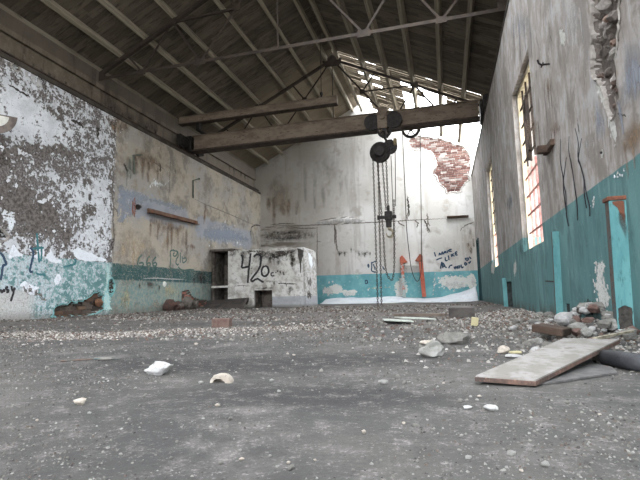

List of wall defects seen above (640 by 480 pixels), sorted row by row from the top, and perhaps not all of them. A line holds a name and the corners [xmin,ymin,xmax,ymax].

spalling [588,0,621,147]
peeling [41,102,68,124]
spalling [408,135,472,194]
peeling [0,136,116,318]
peeling [593,261,611,308]